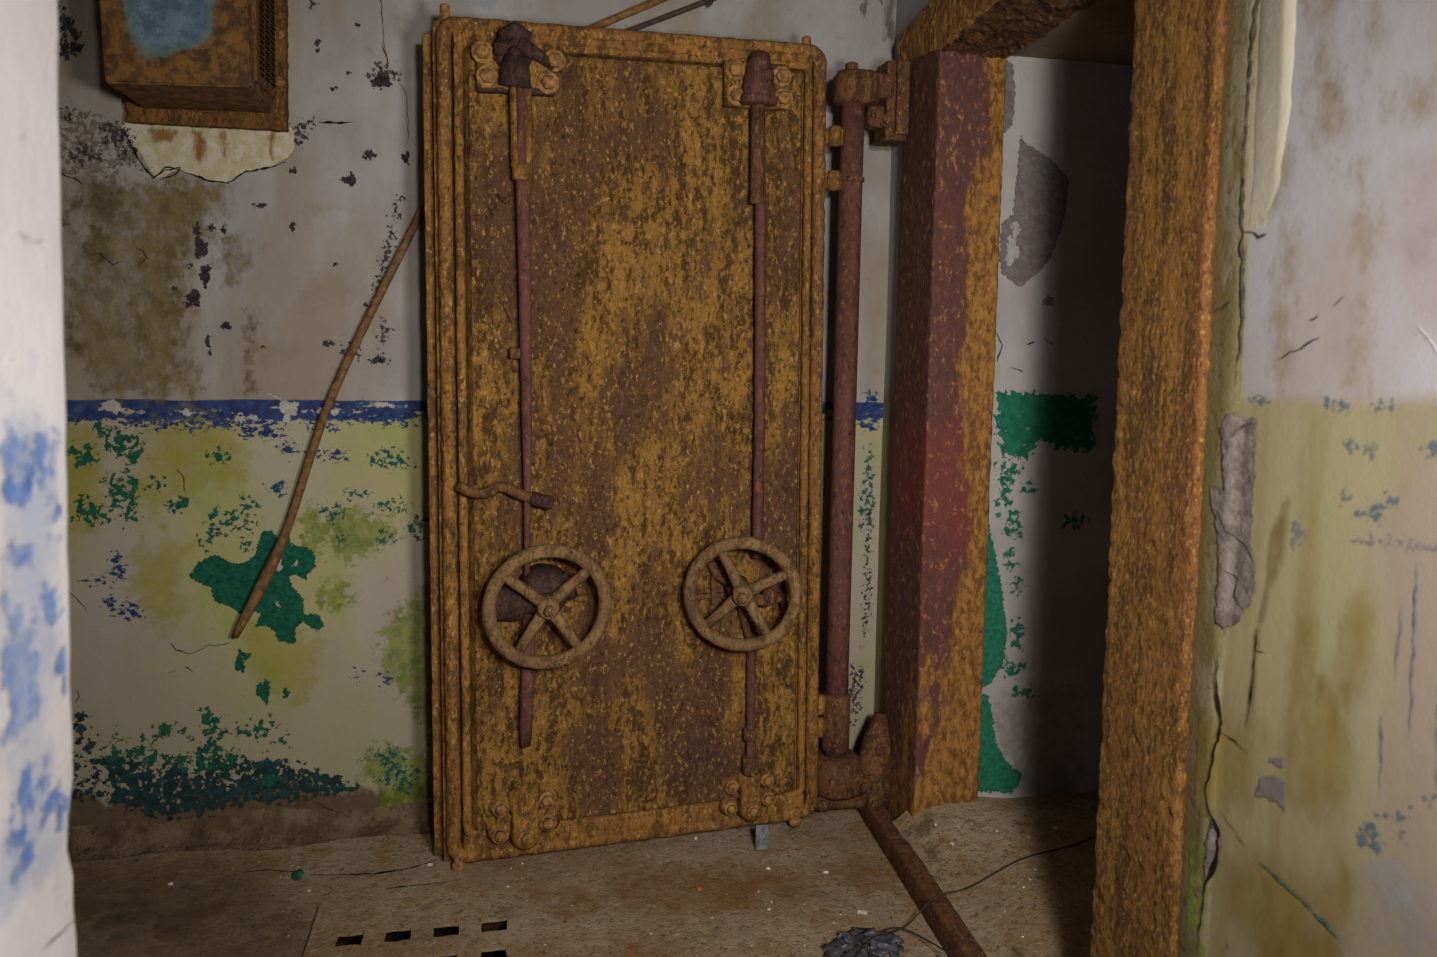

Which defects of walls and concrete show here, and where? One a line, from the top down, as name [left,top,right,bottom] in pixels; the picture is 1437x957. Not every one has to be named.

spalling [58,101,350,184]
peeling [330,60,402,91]
peeling [999,60,1070,286]
peeling [1249,0,1297,230]
damp [68,182,249,396]
damp [322,194,409,364]
peeling [78,550,146,622]
peeling [66,392,420,529]
peeling [189,480,324,644]
spalling [1208,414,1257,629]
peeling [70,679,365,824]
crack [1179,631,1265,955]